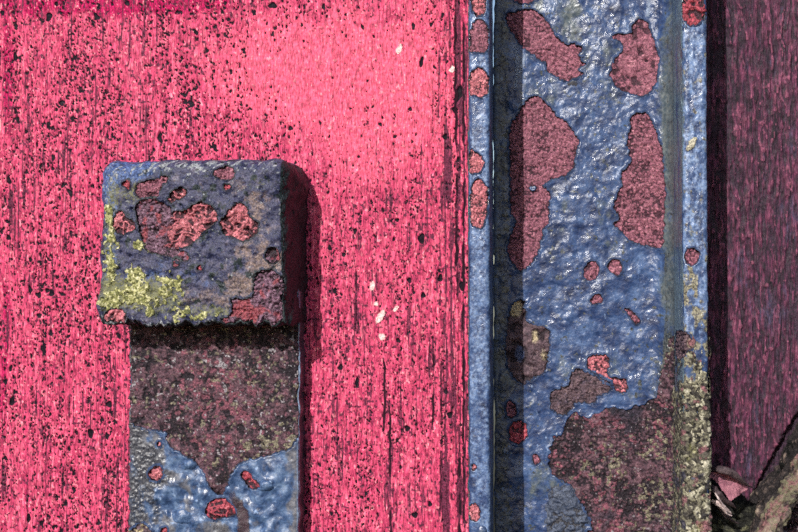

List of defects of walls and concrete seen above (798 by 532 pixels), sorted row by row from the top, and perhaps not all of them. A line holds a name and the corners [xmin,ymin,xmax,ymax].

peeling [469,66,489,99]
peeling [469,0,490,55]
peeling [504,0,587,83]
peeling [606,17,661,99]
peeling [682,0,707,27]
peeling [112,174,261,273]
peeling [469,148,490,230]
peeling [505,94,580,273]
peeling [612,110,667,251]
peeling [584,351,629,394]
peeling [503,398,529,445]
peeling [204,495,237,523]